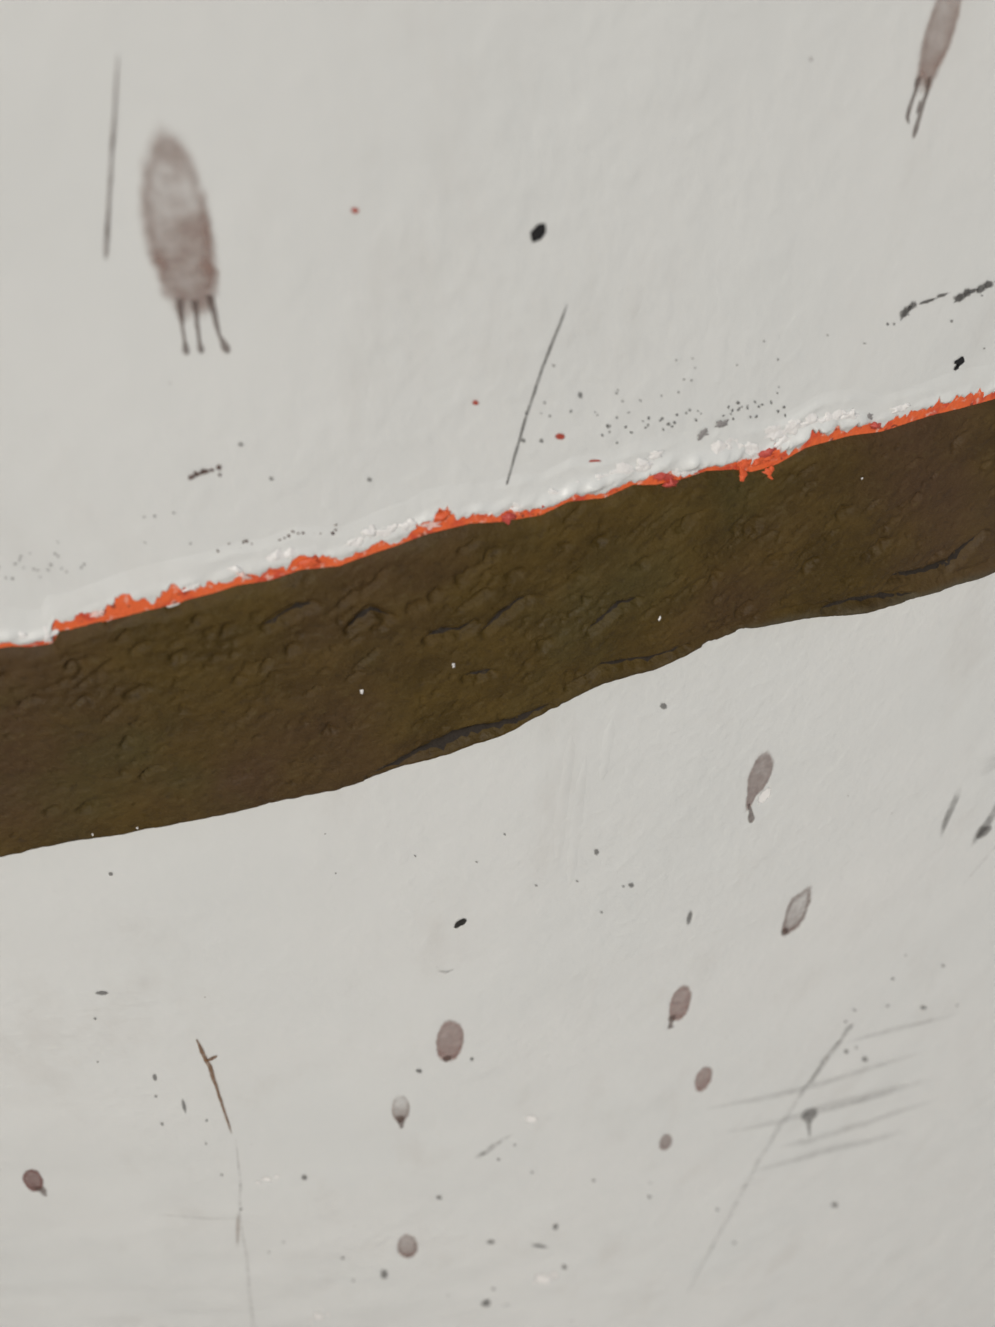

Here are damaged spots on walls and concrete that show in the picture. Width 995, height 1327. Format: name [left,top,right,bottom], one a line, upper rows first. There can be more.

peeling [0,356,995,648]
peeling [758,788,771,804]